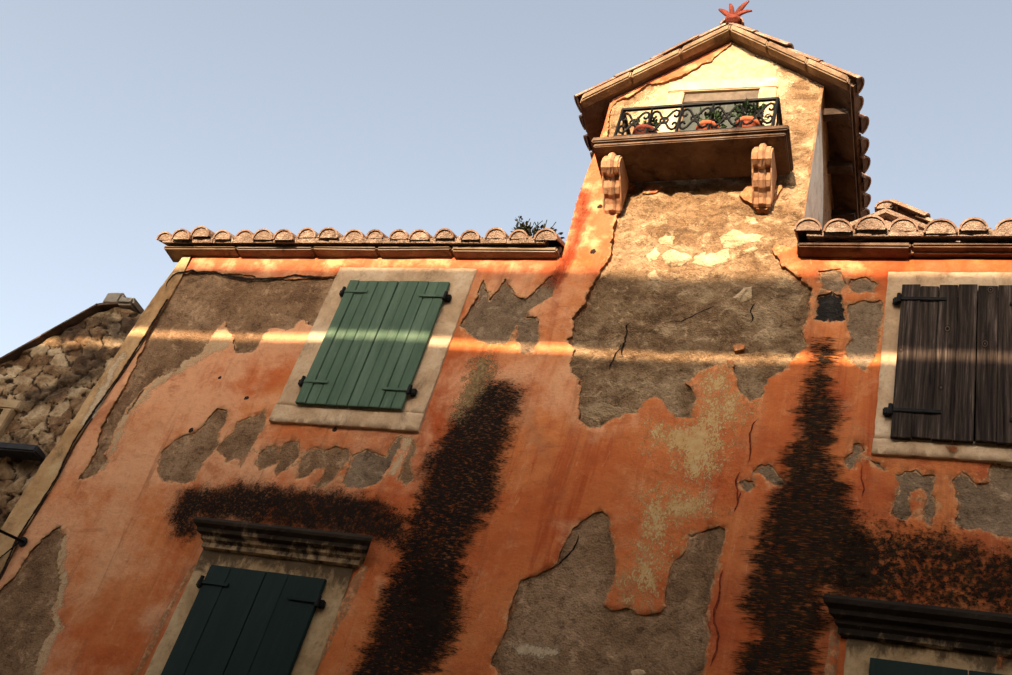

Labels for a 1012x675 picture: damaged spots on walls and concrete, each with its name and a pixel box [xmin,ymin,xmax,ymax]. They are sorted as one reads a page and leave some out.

flaking render [80,273,335,480]
water stain [447,348,507,427]
flaking render [461,277,555,353]
crack [609,322,631,369]
flaking render [492,57,884,675]
flaking render [158,409,417,488]
water stain [387,433,413,476]
flaking render [952,465,1012,537]
flaking render [0,527,72,675]
water stain [388,558,471,675]